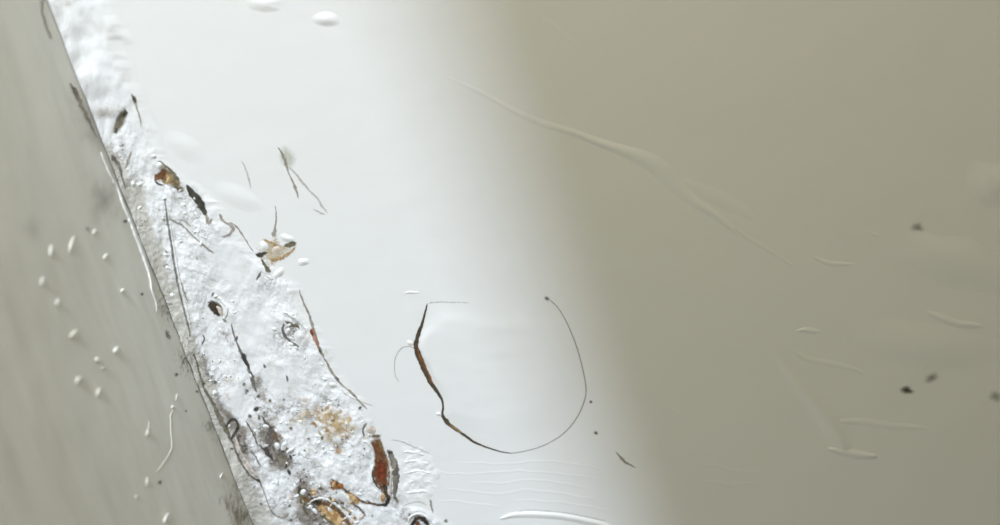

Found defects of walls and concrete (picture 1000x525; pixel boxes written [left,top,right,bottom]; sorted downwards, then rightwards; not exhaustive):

flaking render [47,0,456,525]
crack [299,290,367,409]
water stain [274,442,295,475]